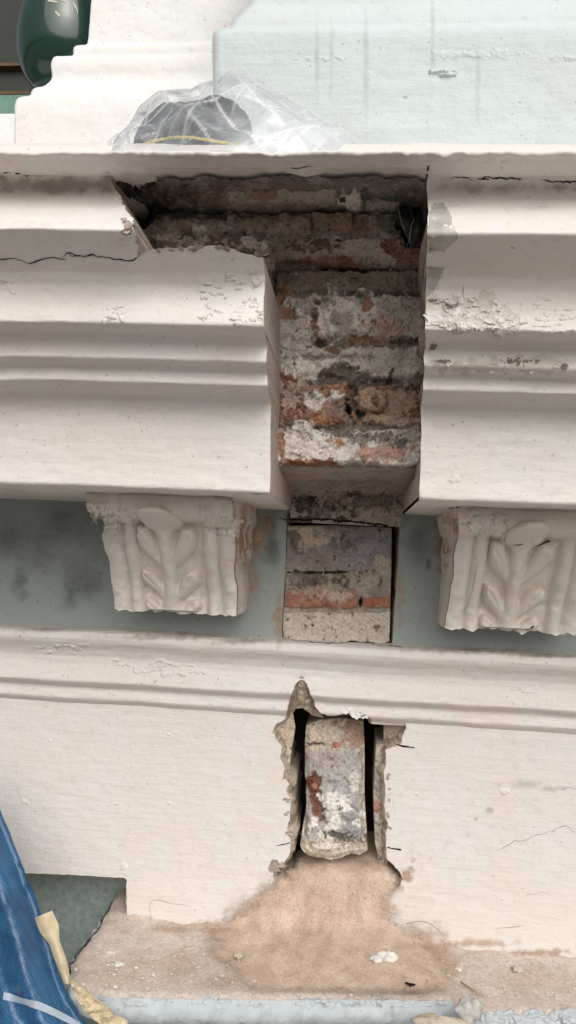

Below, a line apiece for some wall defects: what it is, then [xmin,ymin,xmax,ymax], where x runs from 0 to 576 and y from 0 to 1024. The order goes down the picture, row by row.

spalling [115,174,458,287]
crack [0,253,141,266]
peeling [423,267,523,340]
peeling [87,496,143,531]
peeling [202,507,244,538]
flaking render [272,676,324,783]
spalling [342,706,403,885]
crack [498,826,576,852]
spalling [268,859,285,873]